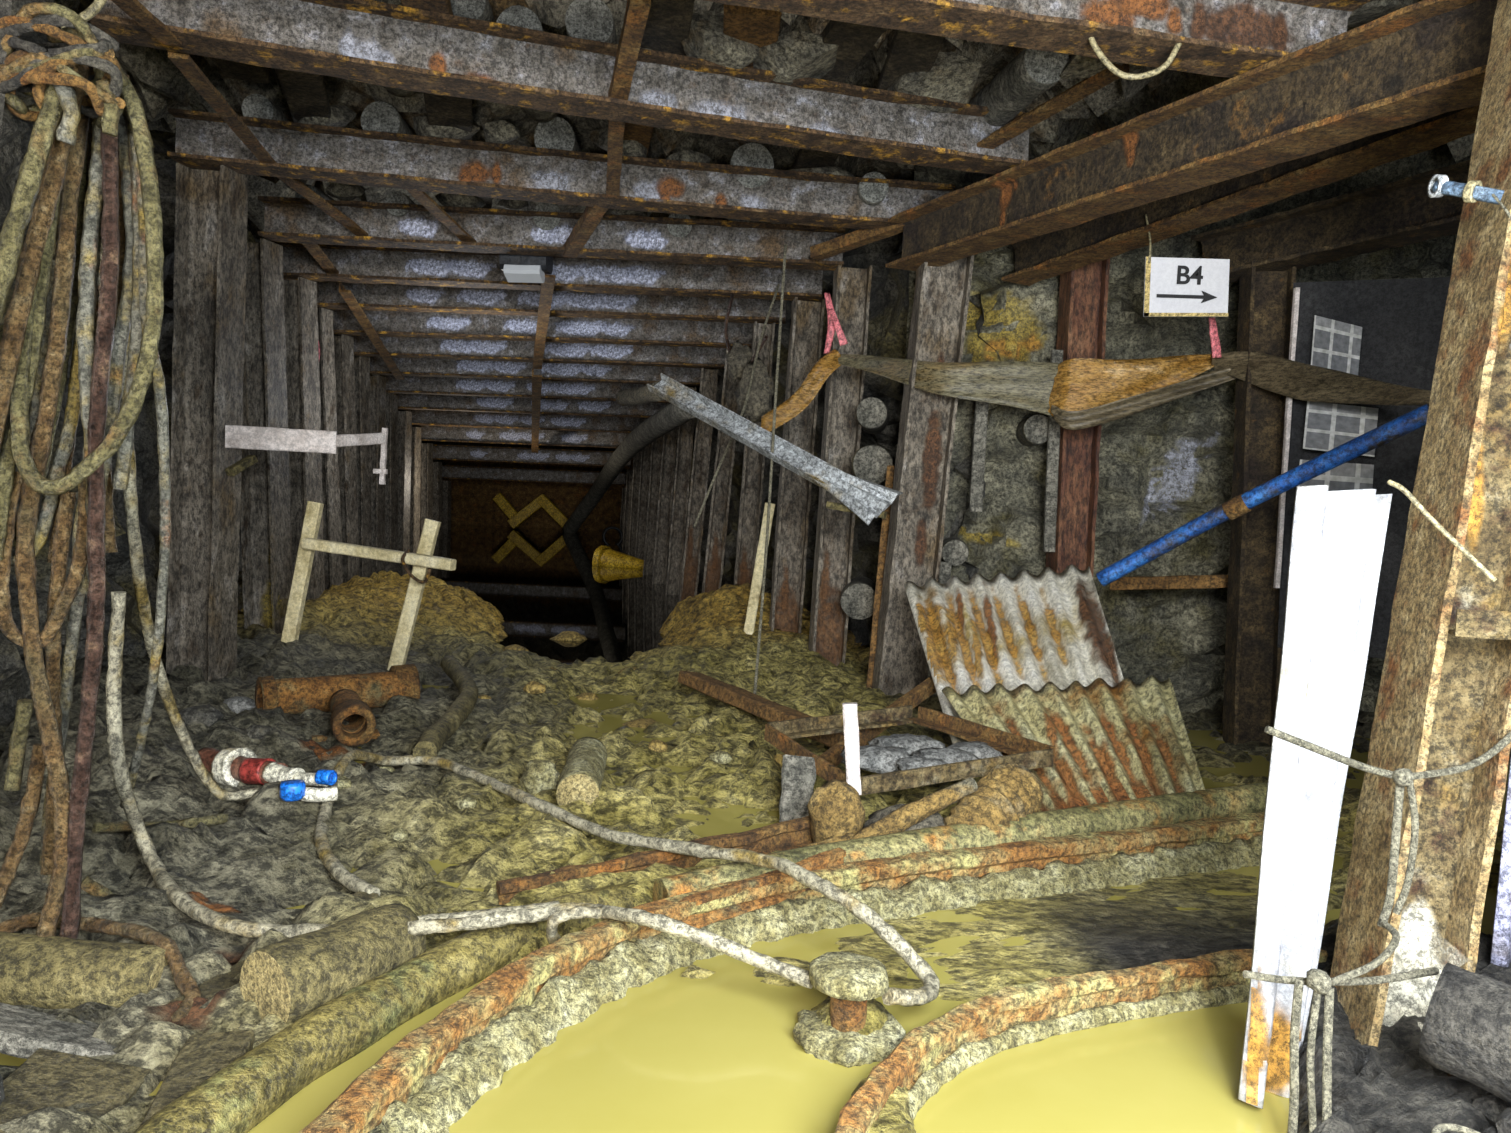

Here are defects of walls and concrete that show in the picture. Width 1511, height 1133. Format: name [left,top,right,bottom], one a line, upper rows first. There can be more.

corrosion [1083,0,1287,51]
corrosion [1092,126,1138,167]
corrosion [989,173,1018,226]
corrosion [1498,262,1511,347]
corrosion [1468,446,1483,534]
corrosion [916,589,1067,692]
corrosion [1076,581,1120,687]
corrosion [1006,718,1023,737]
corrosion [1034,708,1183,811]
corrosion [1243,985,1302,1106]